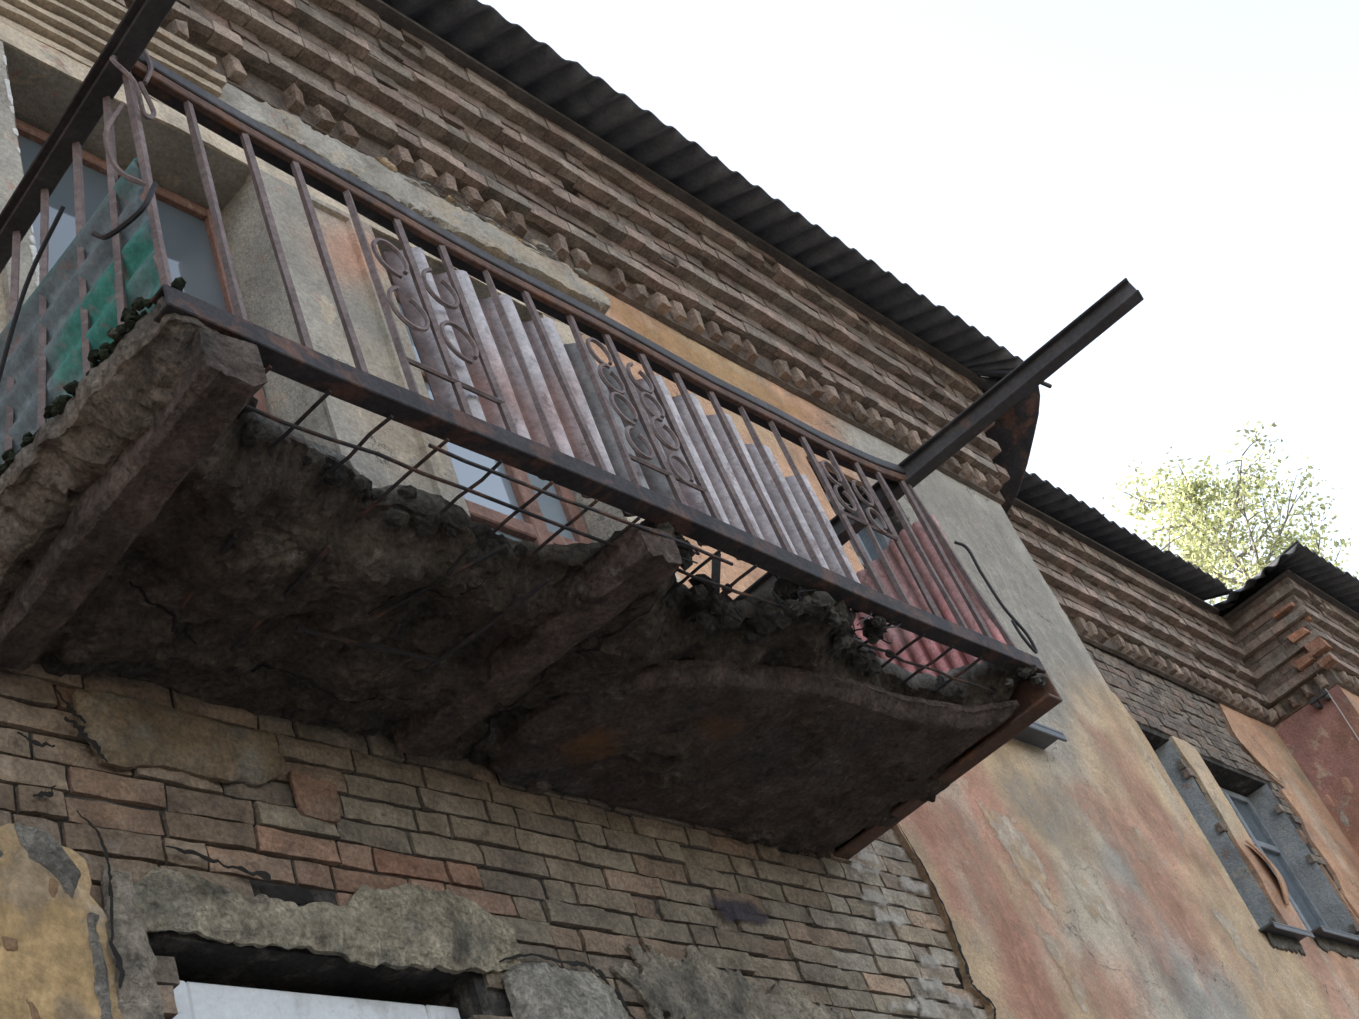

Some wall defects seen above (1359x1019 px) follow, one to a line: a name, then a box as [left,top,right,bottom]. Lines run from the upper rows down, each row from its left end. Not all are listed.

crack [129,581,197,645]
flaking render [1082,641,1327,873]
flaking render [0,664,988,1019]
peeling [980,805,1056,915]
peeling [1245,840,1289,906]